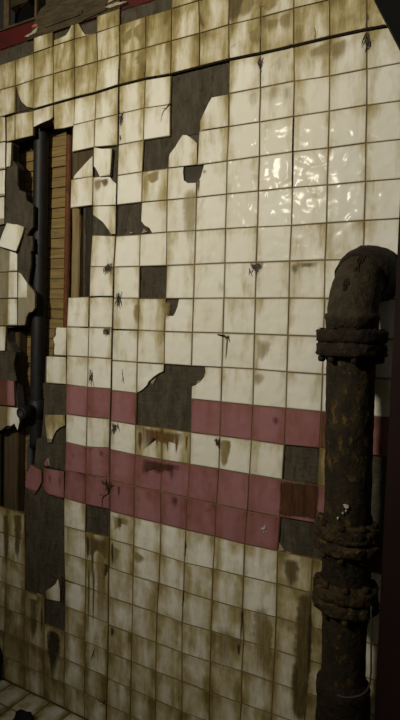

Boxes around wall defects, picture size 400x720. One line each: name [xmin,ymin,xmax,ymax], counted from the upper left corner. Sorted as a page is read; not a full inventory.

spalling [144,60,233,171]
crack [5,24,385,138]
crack [289,117,297,187]
spalling [5,165,35,283]
spalling [84,203,152,297]
spalling [140,266,179,316]
spalling [137,364,205,432]
rust [138,429,187,451]
damp [4,515,21,559]
damp [86,537,118,615]
damp [30,599,59,671]
damp [292,595,312,718]